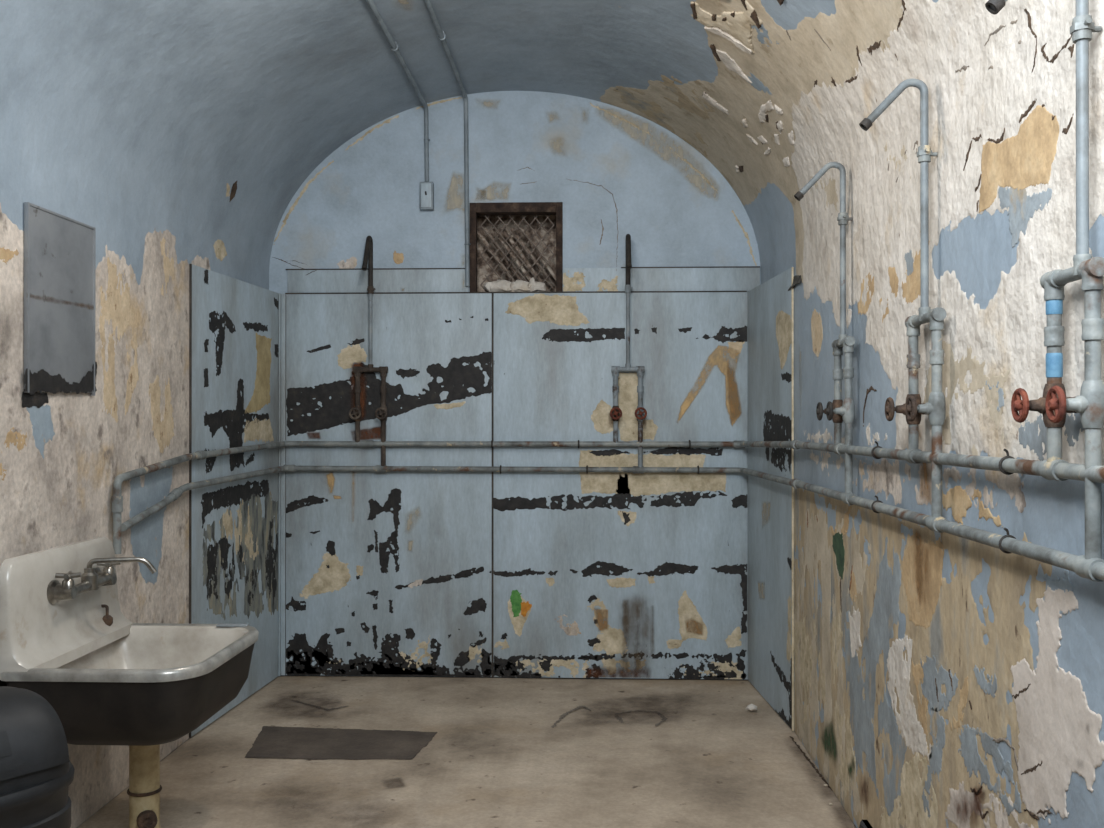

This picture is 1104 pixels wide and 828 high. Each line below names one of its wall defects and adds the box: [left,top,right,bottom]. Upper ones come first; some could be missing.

spalling [226,181,237,201]
peeling [505,270,657,342]
peeling [0,203,364,624]
rust [352,427,381,440]
peeling [286,338,492,436]
peeling [493,372,747,526]
peeling [590,0,1104,828]
peeling [367,488,418,574]
peeling [286,561,764,679]
peeling [67,743,129,828]
peeling [160,733,189,761]